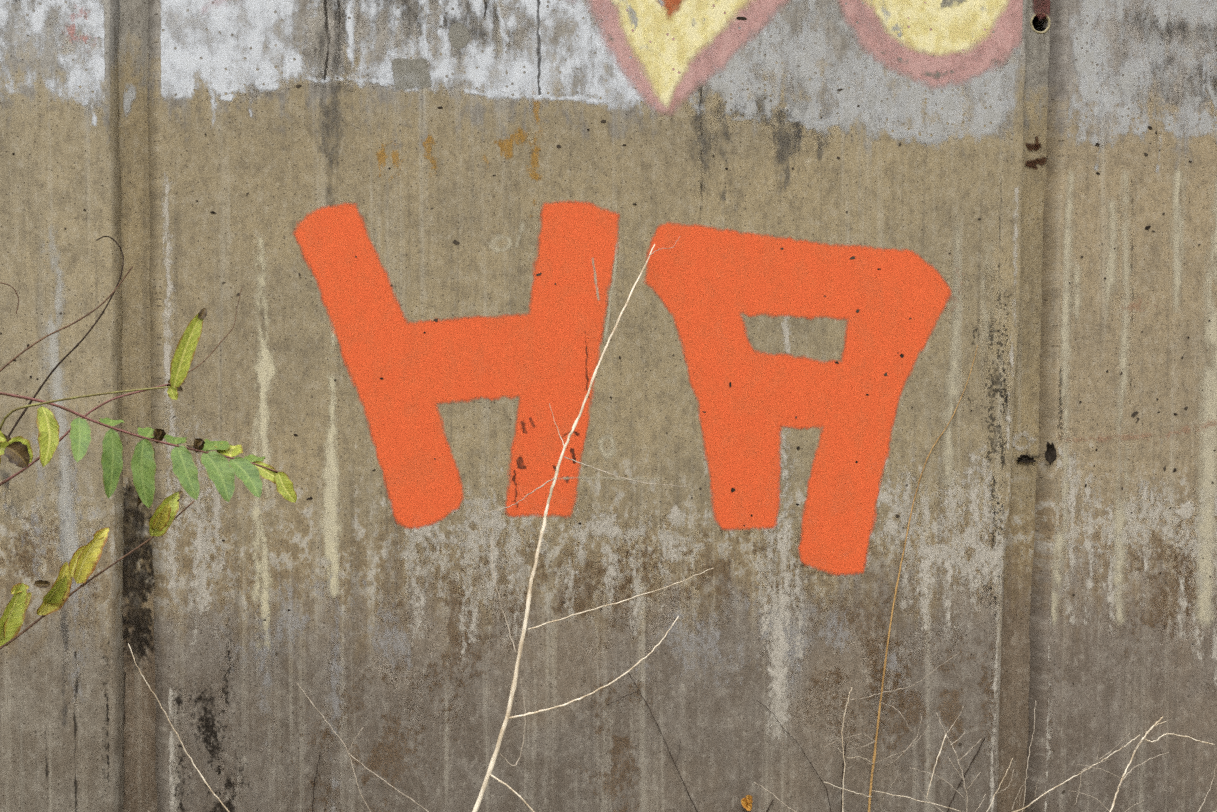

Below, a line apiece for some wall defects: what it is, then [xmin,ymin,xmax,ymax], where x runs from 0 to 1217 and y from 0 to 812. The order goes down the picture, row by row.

corrosion [495,90,541,180]
water stain [398,495,548,672]
water stain [564,509,698,636]
water stain [758,431,809,739]
water stain [168,639,246,812]
water stain [990,636,999,810]